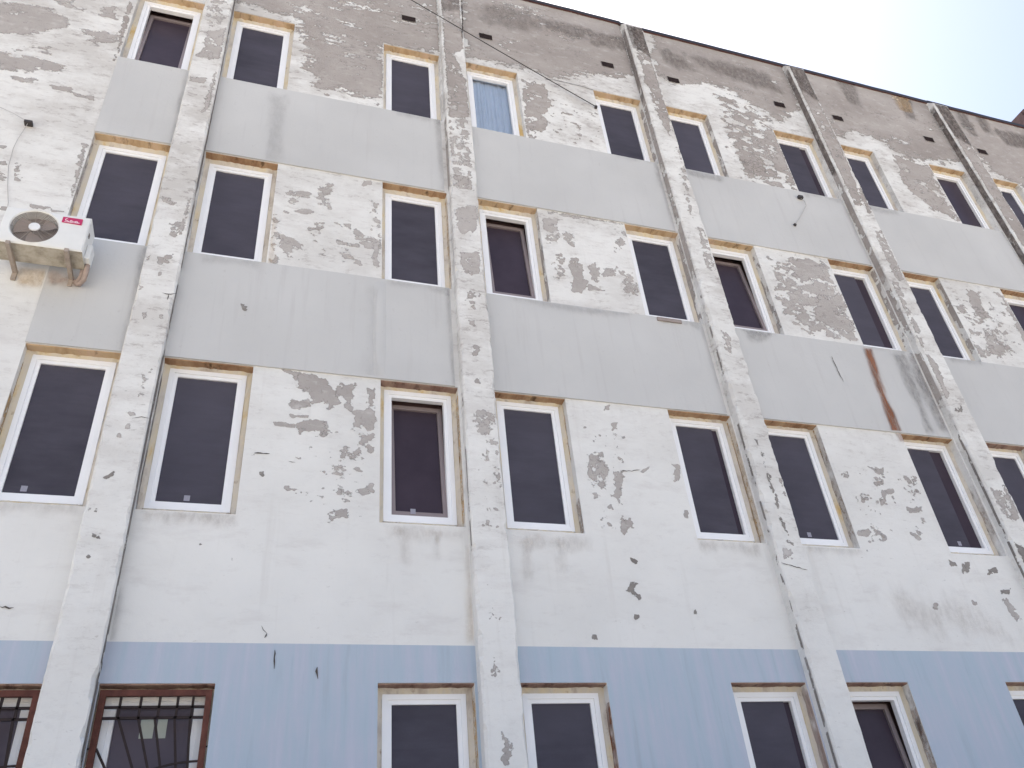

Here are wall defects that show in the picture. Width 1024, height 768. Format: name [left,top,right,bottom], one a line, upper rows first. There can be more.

peeling [0,0,85,35]
peeling [0,46,94,101]
peeling [148,0,1024,412]
rust [866,349,901,431]
peeling [282,369,377,523]
peeling [473,409,501,487]
peeling [584,422,633,535]
peeling [857,526,892,543]
peeling [857,466,925,540]